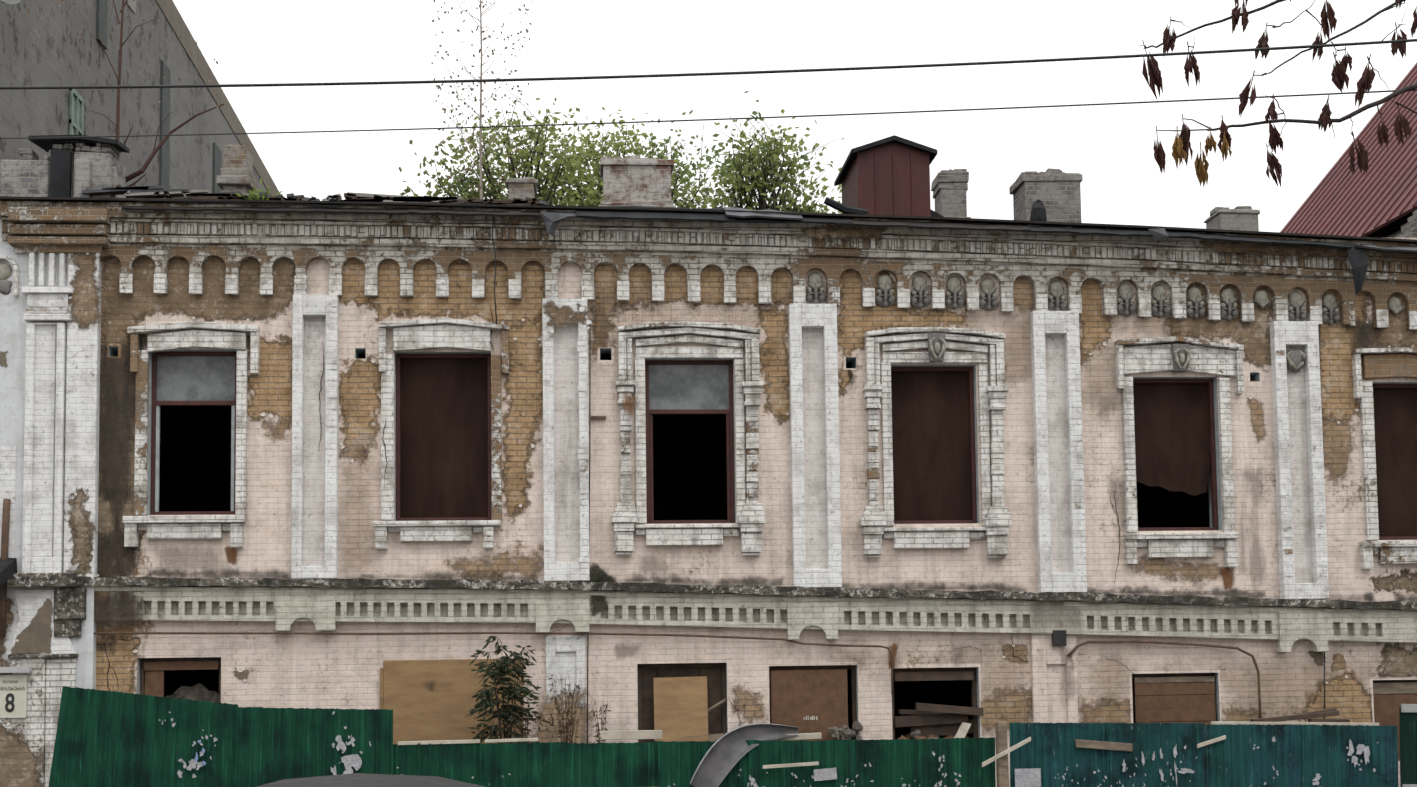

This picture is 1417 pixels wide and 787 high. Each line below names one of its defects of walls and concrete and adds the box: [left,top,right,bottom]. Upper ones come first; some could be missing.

peeling [65,253,296,439]
peeling [339,259,793,524]
spalling [1248,395,1267,442]
peeling [1319,291,1417,483]
peeling [62,412,142,576]
damp [94,334,147,650]
peeling [1135,555,1222,585]
spalling [0,593,53,675]
peeling [732,686,768,723]
peeling [981,688,1033,730]
peeling [1298,642,1417,723]
peeling [0,720,46,787]